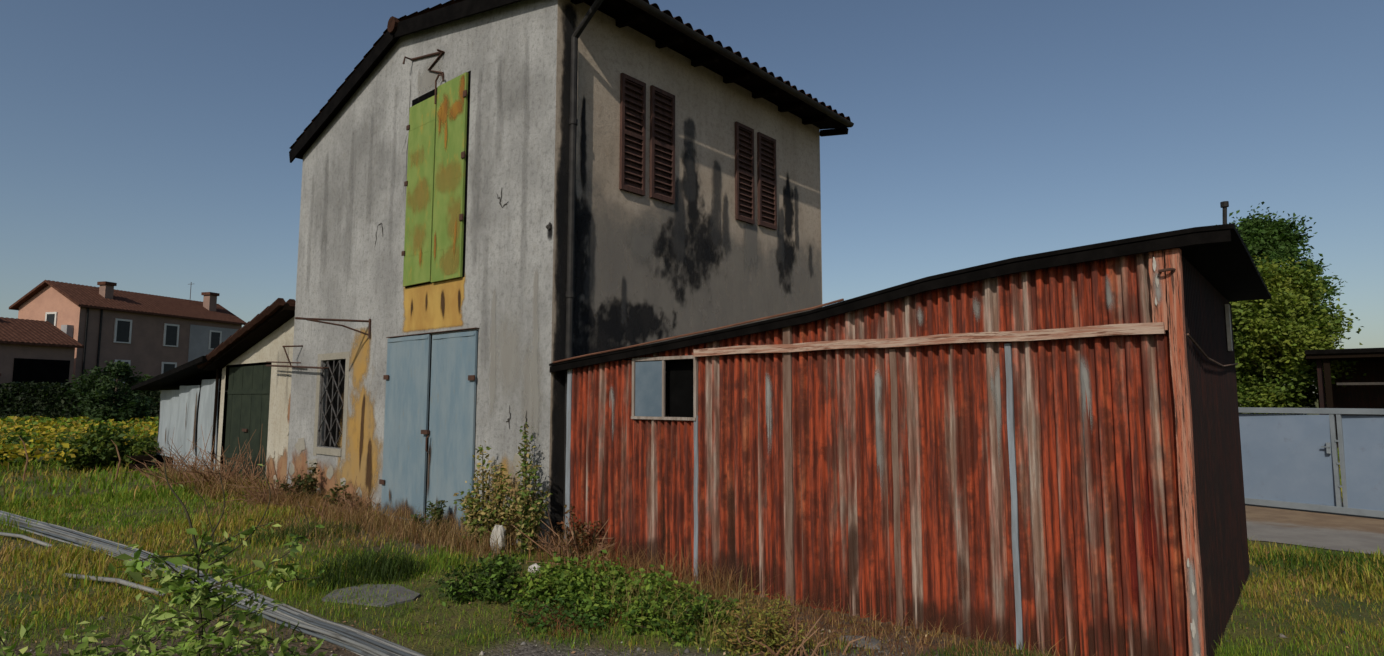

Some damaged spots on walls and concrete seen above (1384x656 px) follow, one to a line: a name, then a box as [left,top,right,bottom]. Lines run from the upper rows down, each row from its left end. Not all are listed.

corrosion [438,75,465,149]
water stain [490,4,822,542]
corrosion [585,464,778,596]
corrosion [806,529,1171,656]
corrosion [1125,454,1157,602]